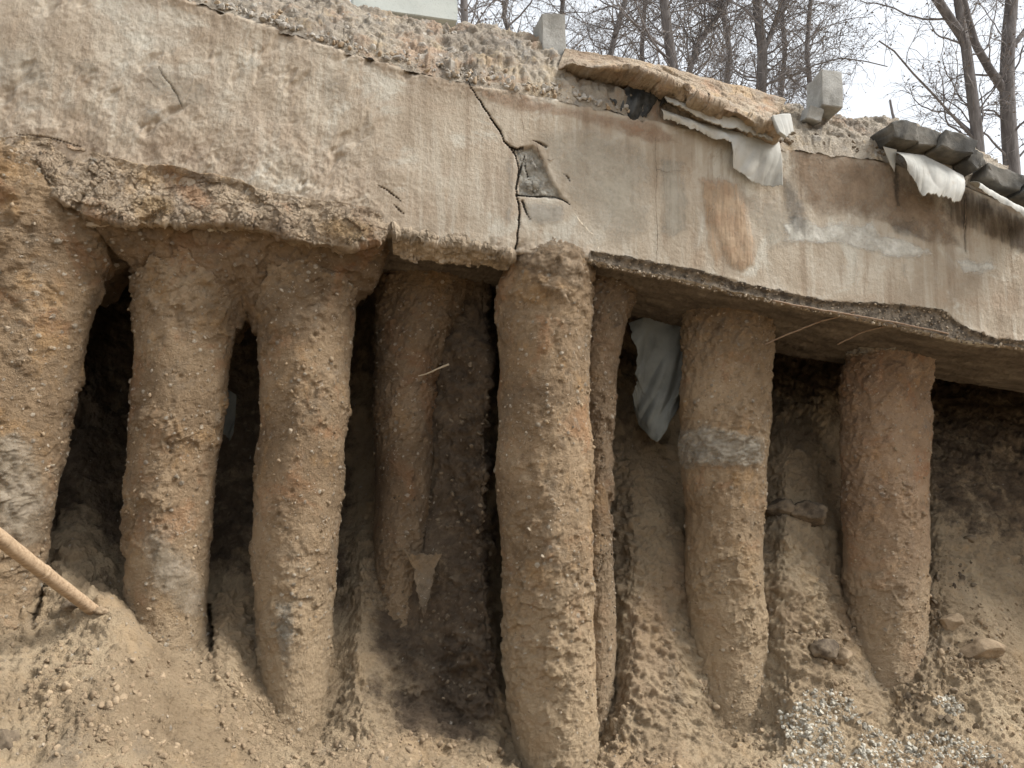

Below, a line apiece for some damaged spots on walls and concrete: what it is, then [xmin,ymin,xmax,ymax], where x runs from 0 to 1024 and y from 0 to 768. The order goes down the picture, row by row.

crack [467,79,599,250]
spalling [517,148,559,199]
spalling [392,221,1024,350]
damp [948,190,1024,252]